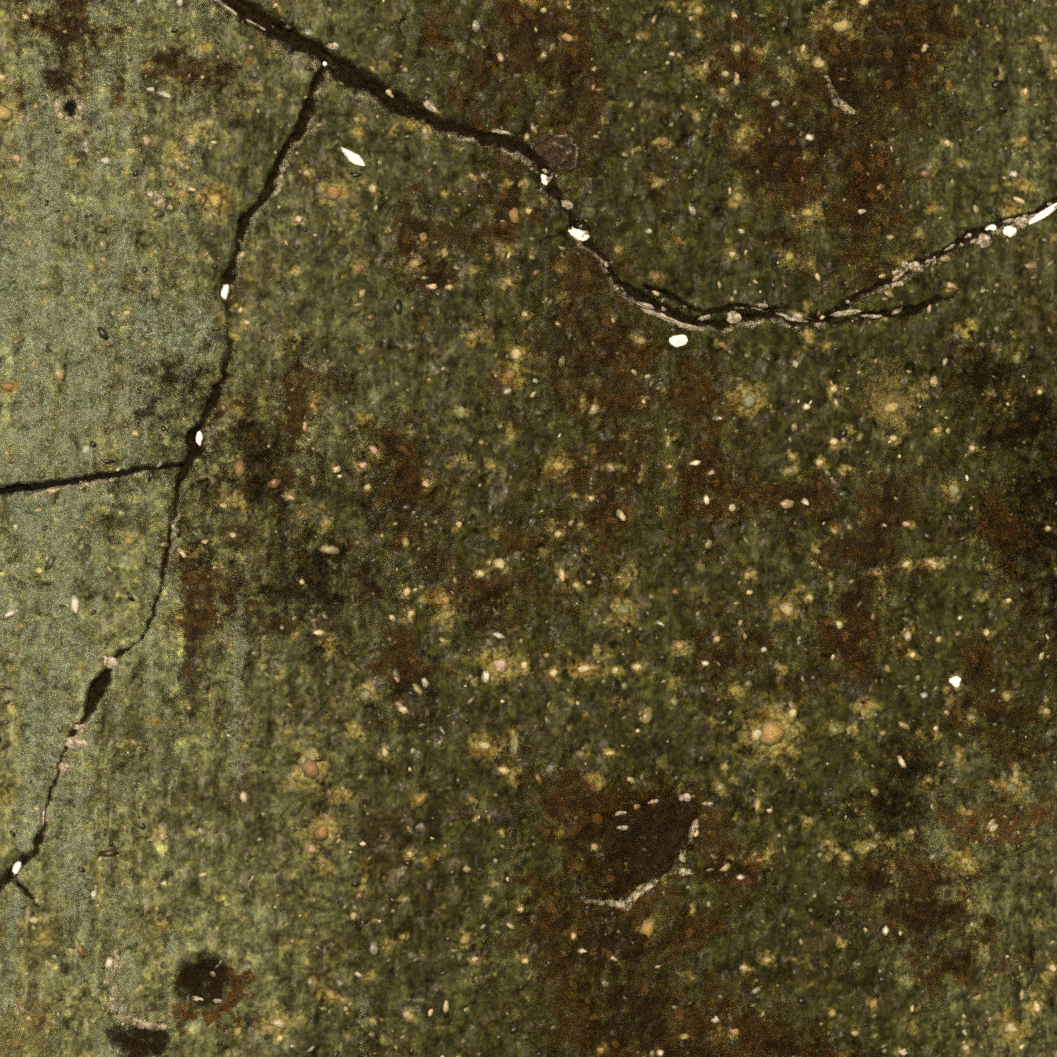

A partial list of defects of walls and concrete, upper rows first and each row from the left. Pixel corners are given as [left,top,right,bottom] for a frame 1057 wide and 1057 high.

crack [212,0,1057,347]
crack [0,331,232,907]
crack [1025,898,1038,999]